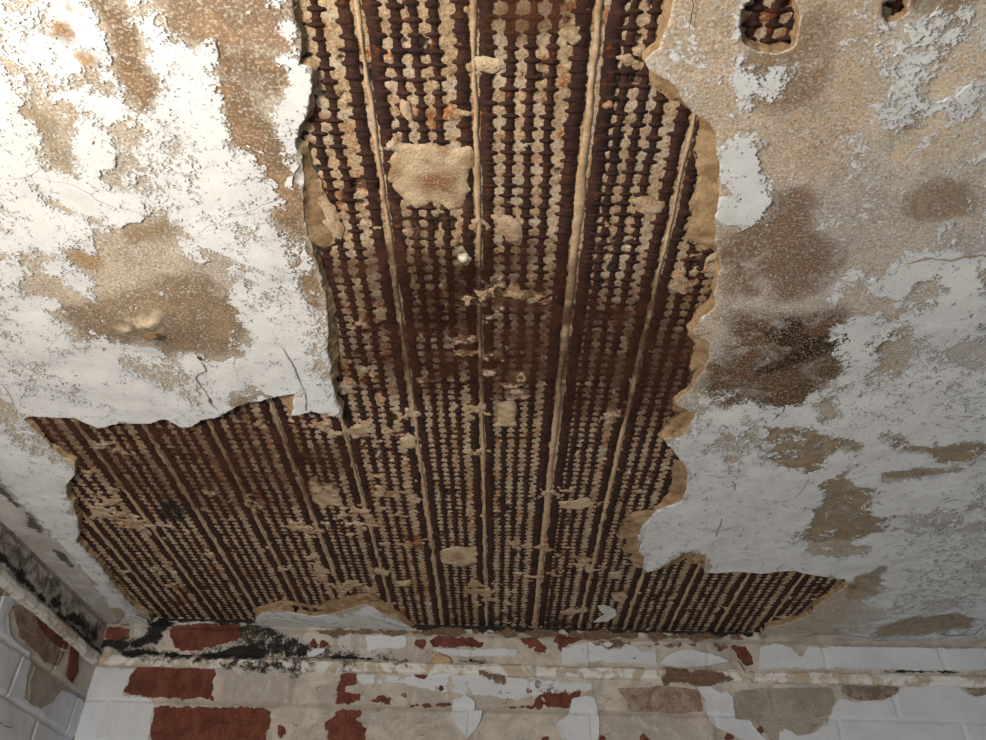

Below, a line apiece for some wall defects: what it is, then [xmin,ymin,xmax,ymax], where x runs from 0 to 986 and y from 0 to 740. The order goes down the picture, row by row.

water stain [96,0,156,108]
peeling [874,0,986,140]
water stain [169,0,320,307]
water stain [65,277,242,353]
flaking render [0,0,848,636]
water stain [706,311,888,411]
peeling [637,251,986,579]
peeling [0,587,286,740]
water stain [0,528,754,678]
peeling [325,673,606,740]
water stain [661,667,736,687]
peeling [618,685,986,740]